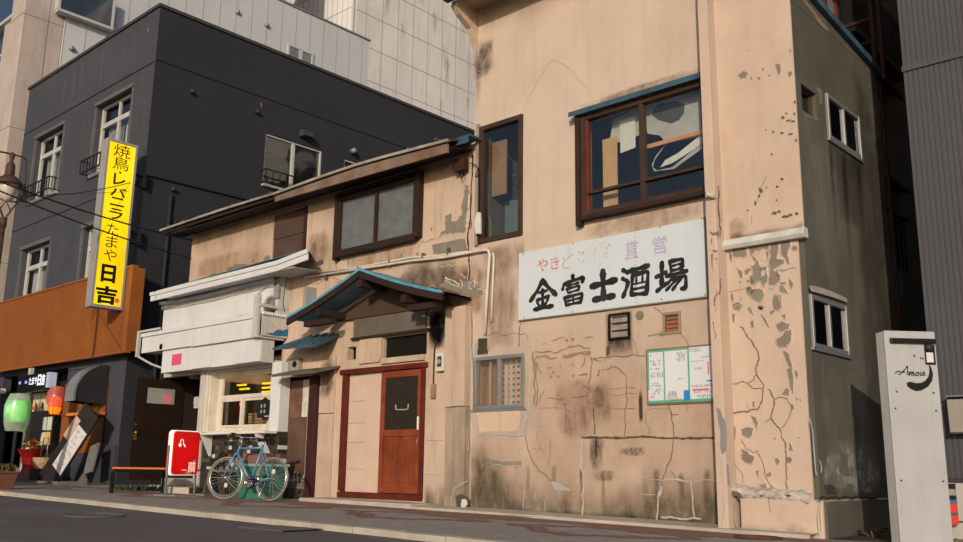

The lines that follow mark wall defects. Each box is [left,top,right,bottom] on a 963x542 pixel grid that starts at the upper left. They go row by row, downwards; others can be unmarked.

water stain [476,46,491,72]
peeling [738,64,792,80]
peeling [430,183,471,238]
crack [419,154,484,293]
crack [717,176,767,235]
crack [713,278,743,339]
peeling [709,231,801,410]
crack [424,312,878,528]